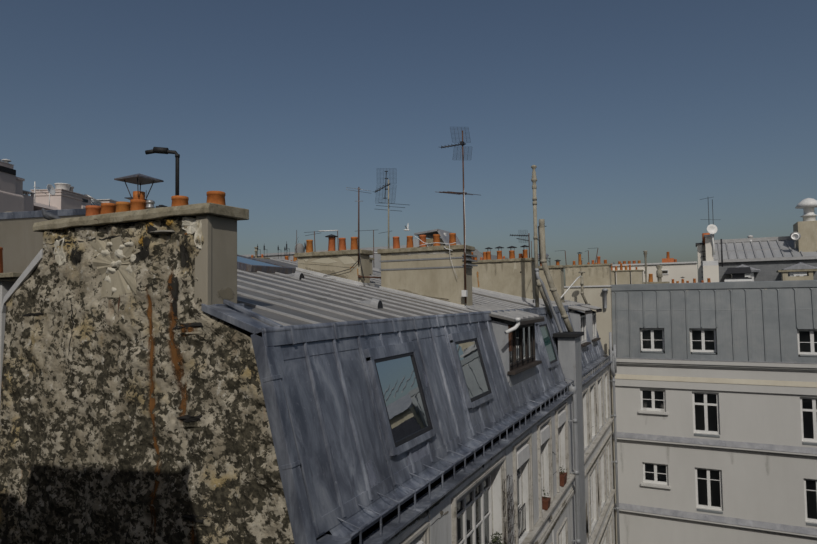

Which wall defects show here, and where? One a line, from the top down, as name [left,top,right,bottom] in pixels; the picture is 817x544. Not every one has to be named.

water stain [130,237,152,262]
water stain [168,274,179,318]
rust [168,274,194,416]
rust [147,291,160,543]